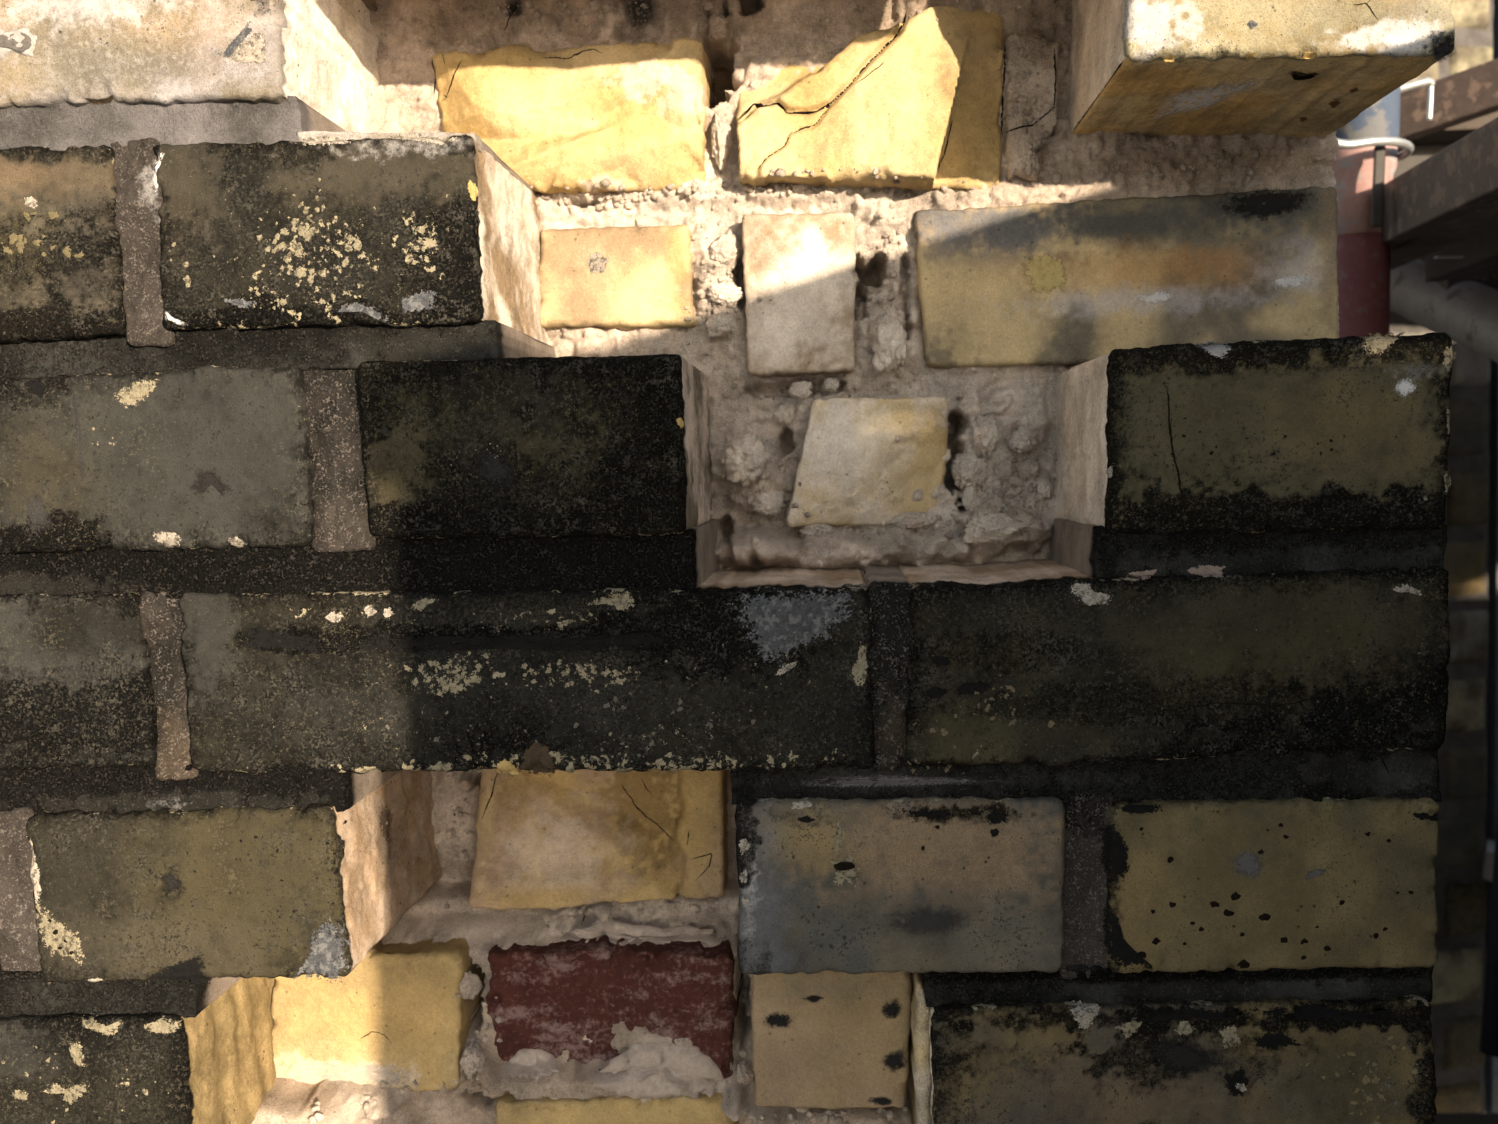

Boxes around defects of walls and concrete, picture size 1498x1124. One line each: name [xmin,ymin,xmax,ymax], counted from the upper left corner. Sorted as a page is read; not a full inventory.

crack [740,11,907,169]
crack [938,120,953,170]
spalling [587,252,609,274]